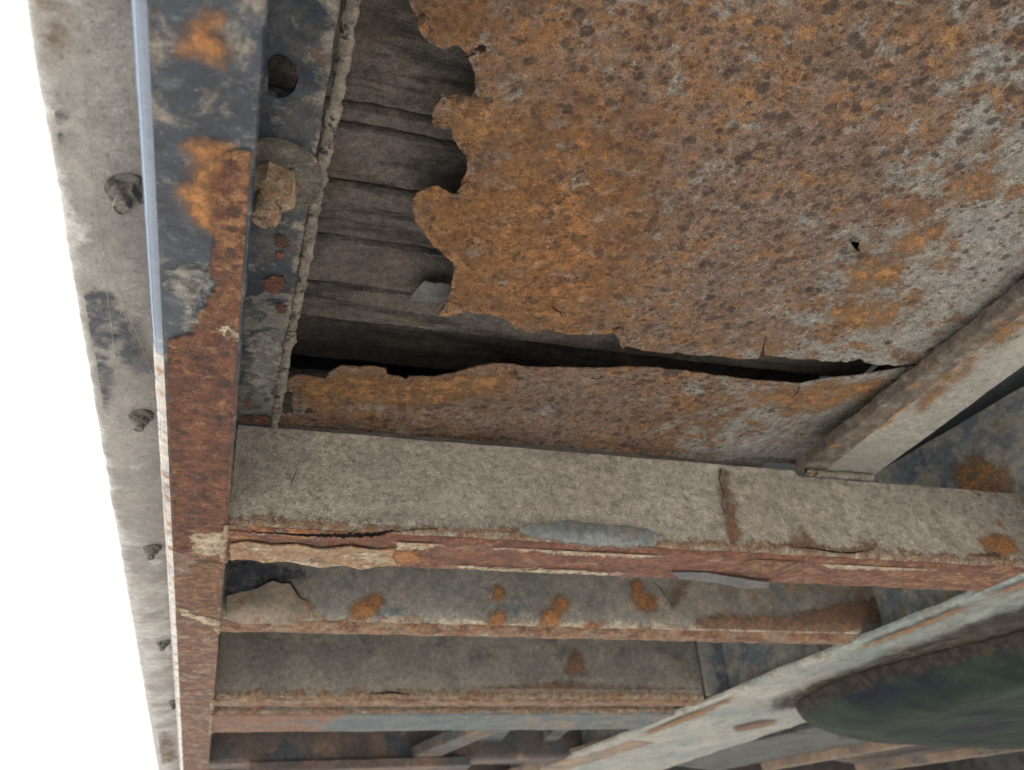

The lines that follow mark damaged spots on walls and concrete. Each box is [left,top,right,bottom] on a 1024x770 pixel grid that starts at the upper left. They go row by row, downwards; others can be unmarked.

rust [180,14,226,66]
peeling [416,15,430,41]
peeling [432,97,452,119]
rust [830,222,949,332]
peeling [438,301,464,317]
rust [167,140,271,617]
rust [297,370,512,405]
rust [952,455,1014,493]
crack [229,528,438,539]
rust [969,534,1019,558]
peeling [177,532,397,627]
rust [159,732,174,763]